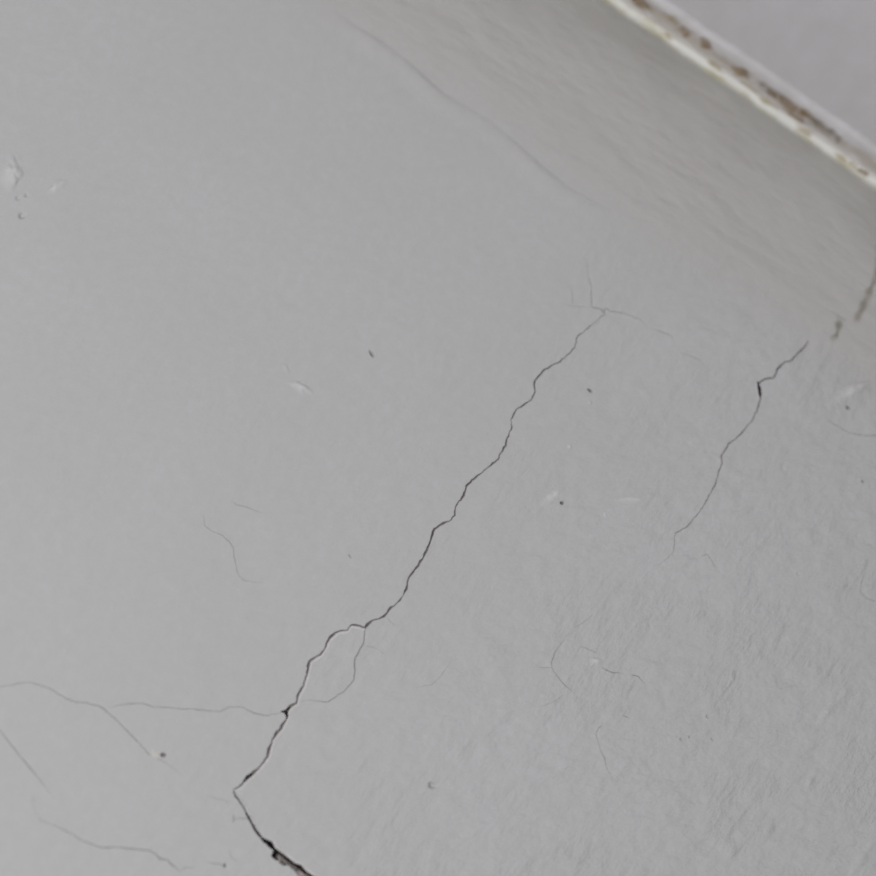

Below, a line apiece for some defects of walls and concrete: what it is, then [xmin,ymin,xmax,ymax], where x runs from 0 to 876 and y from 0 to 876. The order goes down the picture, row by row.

rust [780,96,808,122]
crack [658,340,811,566]
crack [0,262,699,876]